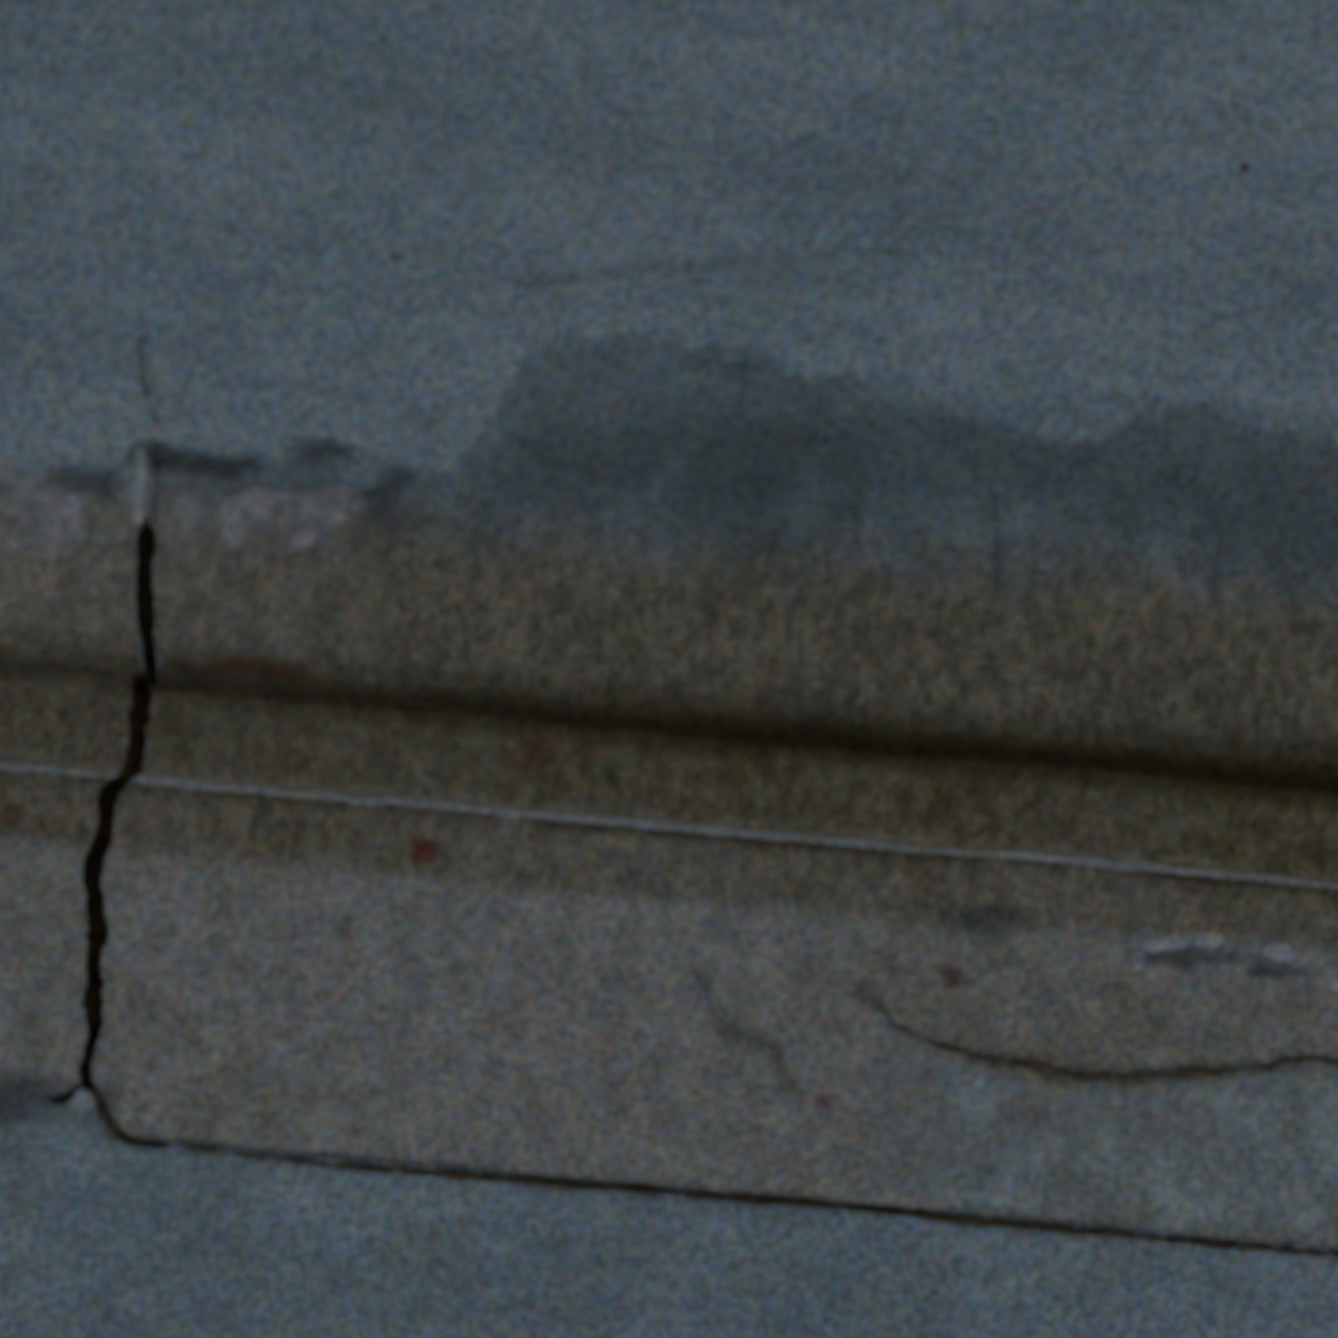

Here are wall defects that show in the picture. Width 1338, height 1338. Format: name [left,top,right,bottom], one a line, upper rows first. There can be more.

leakage [516,429,854,534]
crack [51,340,1338,1257]